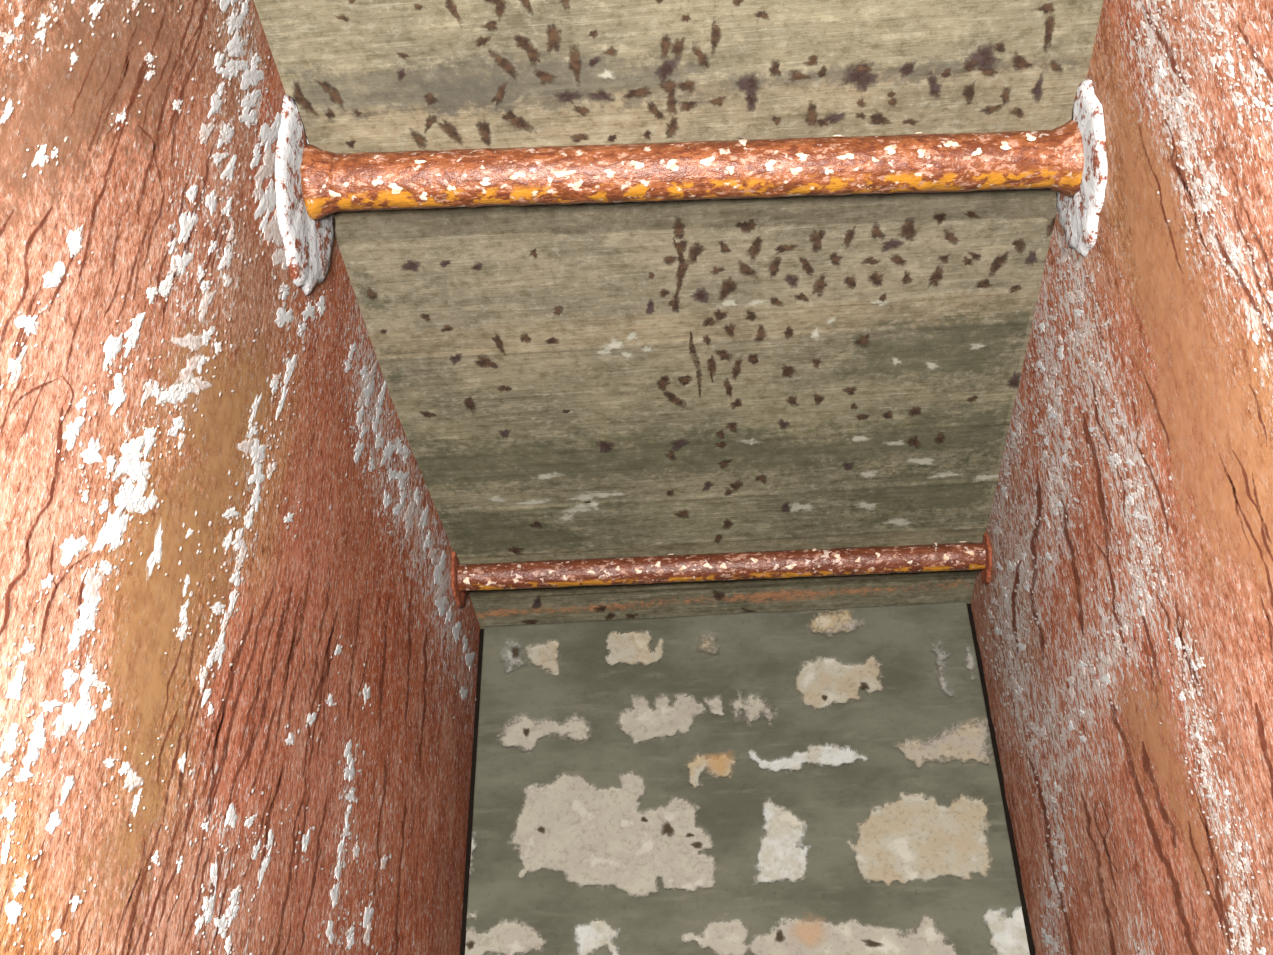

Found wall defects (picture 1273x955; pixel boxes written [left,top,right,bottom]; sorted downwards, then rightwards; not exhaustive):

rust [0,0,209,319]
rust [0,254,74,435]
rust [54,322,339,955]
spalling [617,693,773,744]
spalling [796,657,883,709]
rust [1011,480,1045,660]
peeling [965,252,1181,955]
rust [1083,376,1129,657]
spalling [511,743,868,897]
spalling [846,792,993,886]
rust [1109,699,1231,955]
spalling [681,916,957,955]